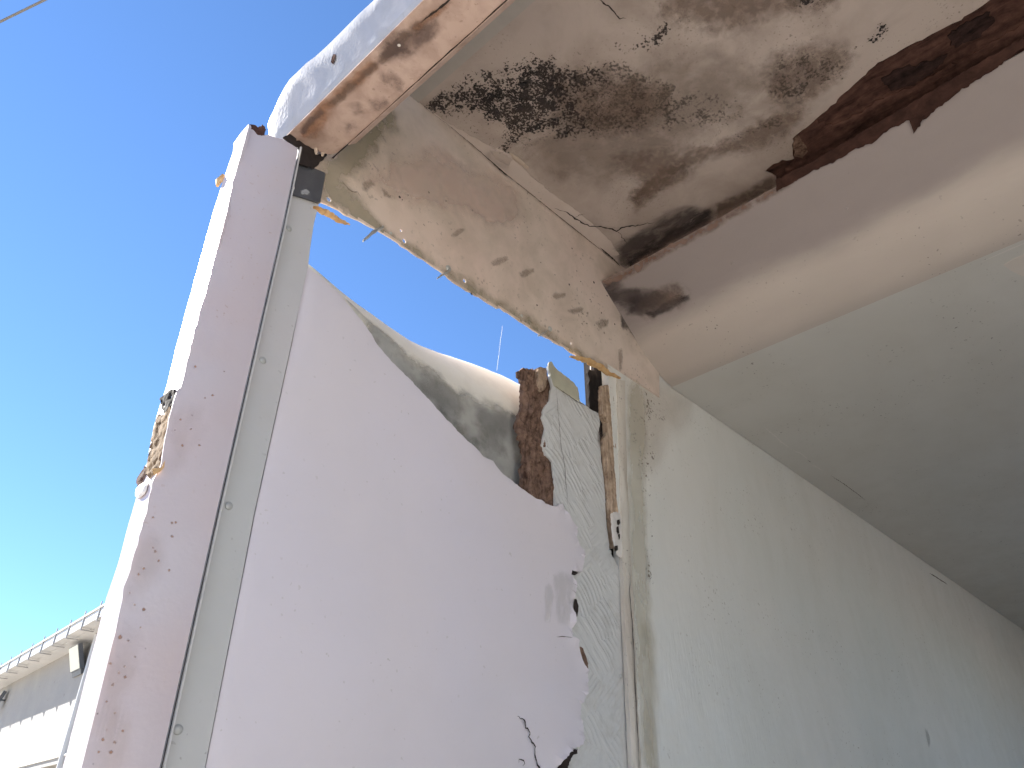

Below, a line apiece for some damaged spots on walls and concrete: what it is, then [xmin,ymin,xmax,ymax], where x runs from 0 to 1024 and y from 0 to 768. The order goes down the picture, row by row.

crack [332,0,651,266]
damp [424,21,736,153]
damp [723,52,843,151]
peeling [775,37,1024,191]
damp [619,179,774,266]
damp [604,283,688,327]
peeling [135,389,176,498]
damp [368,322,522,485]
peeling [548,362,580,401]
peeling [610,512,622,558]
crack [518,716,540,768]